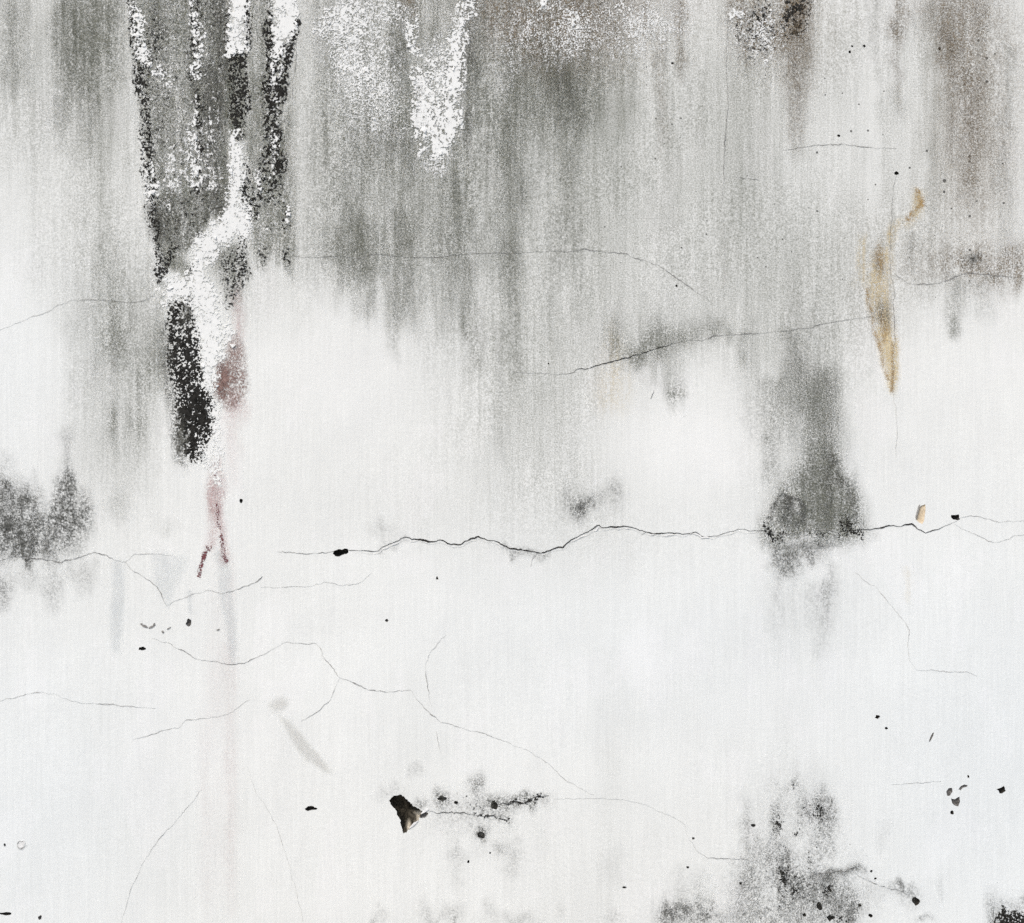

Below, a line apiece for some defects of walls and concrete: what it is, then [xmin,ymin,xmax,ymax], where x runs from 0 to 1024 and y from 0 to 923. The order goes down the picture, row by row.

leakage [731,0,813,82]
leakage [54,0,302,310]
leakage [315,0,625,279]
leakage [137,296,217,464]
corrosion [863,233,898,391]
leakage [0,468,90,567]
crack [0,515,1024,601]
leakage [763,363,864,572]
spalling [389,795,429,833]
crack [302,639,781,865]
leakage [738,813,860,923]
leakage [801,790,834,843]